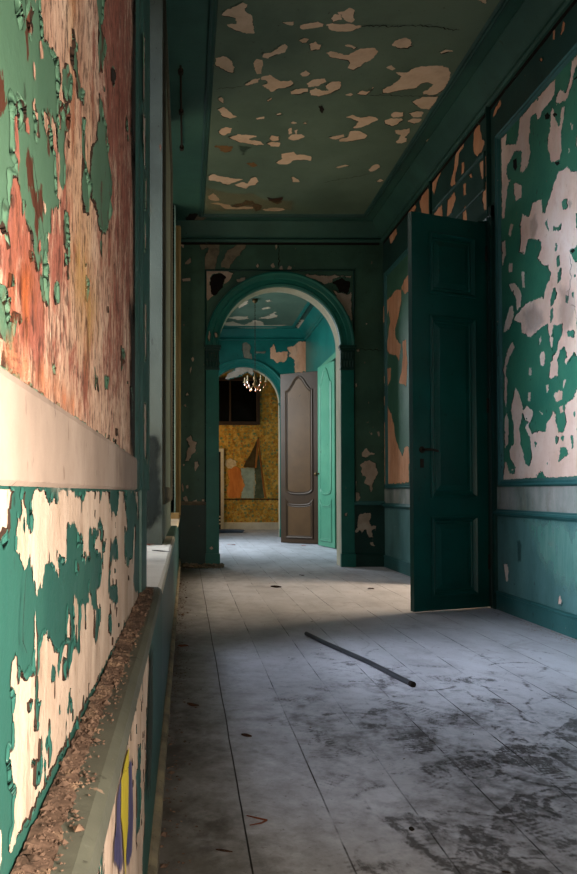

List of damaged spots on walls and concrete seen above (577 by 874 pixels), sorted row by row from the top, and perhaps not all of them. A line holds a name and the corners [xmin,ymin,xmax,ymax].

peeling [220,1,257,34]
peeling [281,8,378,71]
peeling [207,162,259,189]
peeling [214,96,313,165]
peeling [243,44,452,143]
peeling [410,123,486,220]
peeling [0,0,147,461]
peeling [500,54,577,480]
peeling [225,341,306,380]
peeling [356,276,410,501]
peeling [0,486,139,864]
peeling [98,654,150,874]